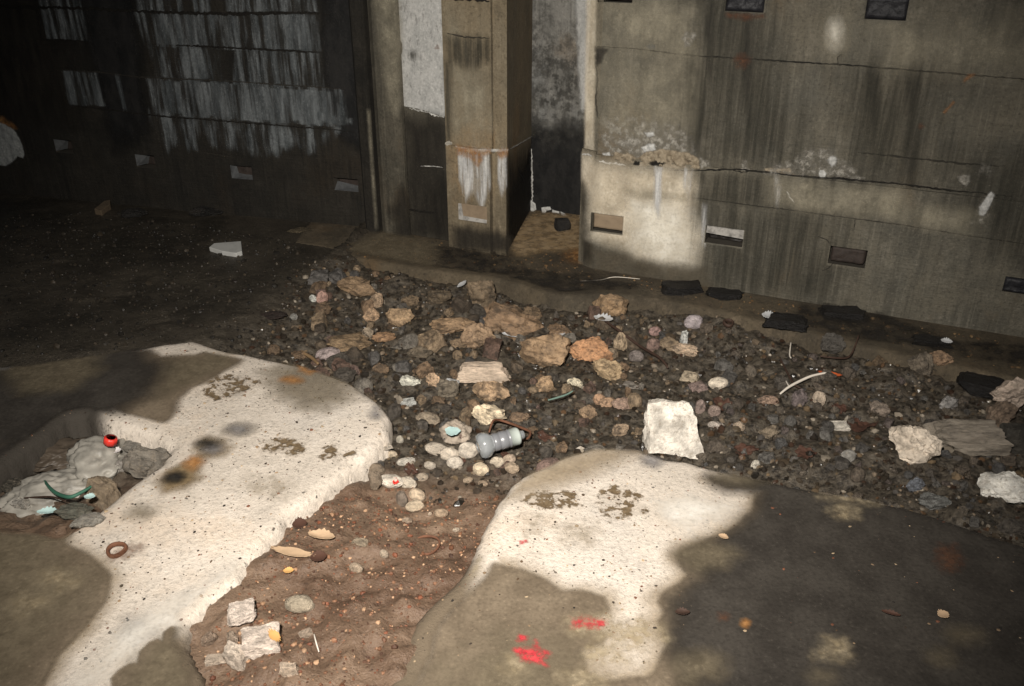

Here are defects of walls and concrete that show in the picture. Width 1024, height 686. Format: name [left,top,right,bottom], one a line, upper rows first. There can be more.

leakage [446,70,508,206]
spalling [603,132,709,169]
leakage [575,0,826,296]
crack [595,46,1024,117]
crack [640,152,1023,271]